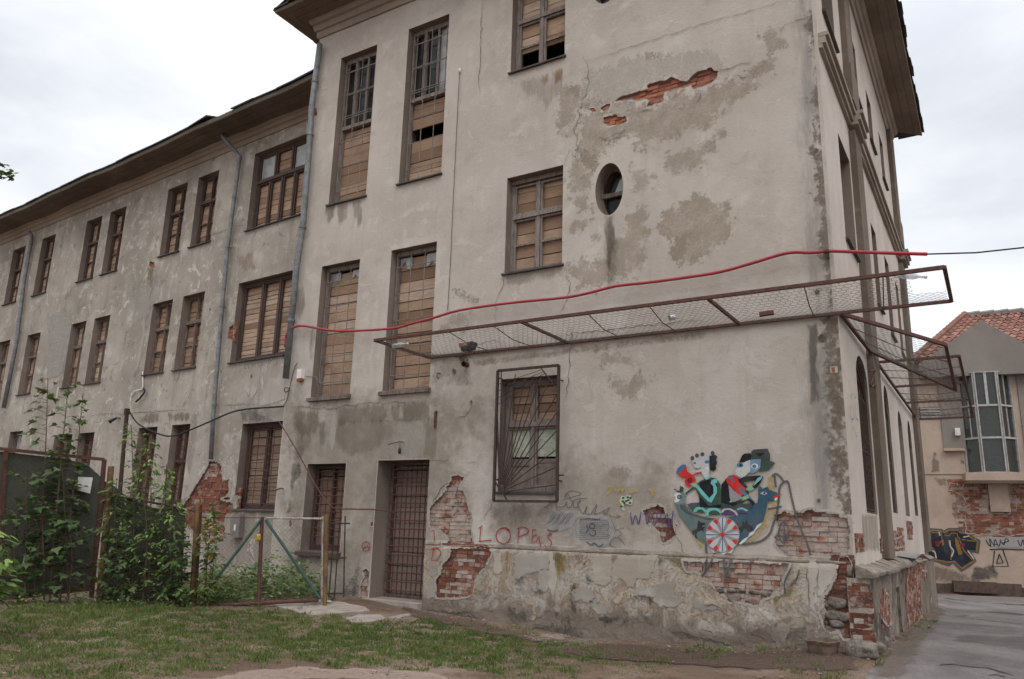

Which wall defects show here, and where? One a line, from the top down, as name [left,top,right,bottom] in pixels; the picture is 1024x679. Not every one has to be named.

flaking render [576,60,774,170]
crack [565,0,807,162]
leakage [803,10,814,45]
leakage [606,219,614,266]
leakage [809,66,852,515]
flaking render [184,455,243,546]
flaking render [424,473,558,621]
flaking render [572,498,892,643]
flaking render [932,453,1024,537]